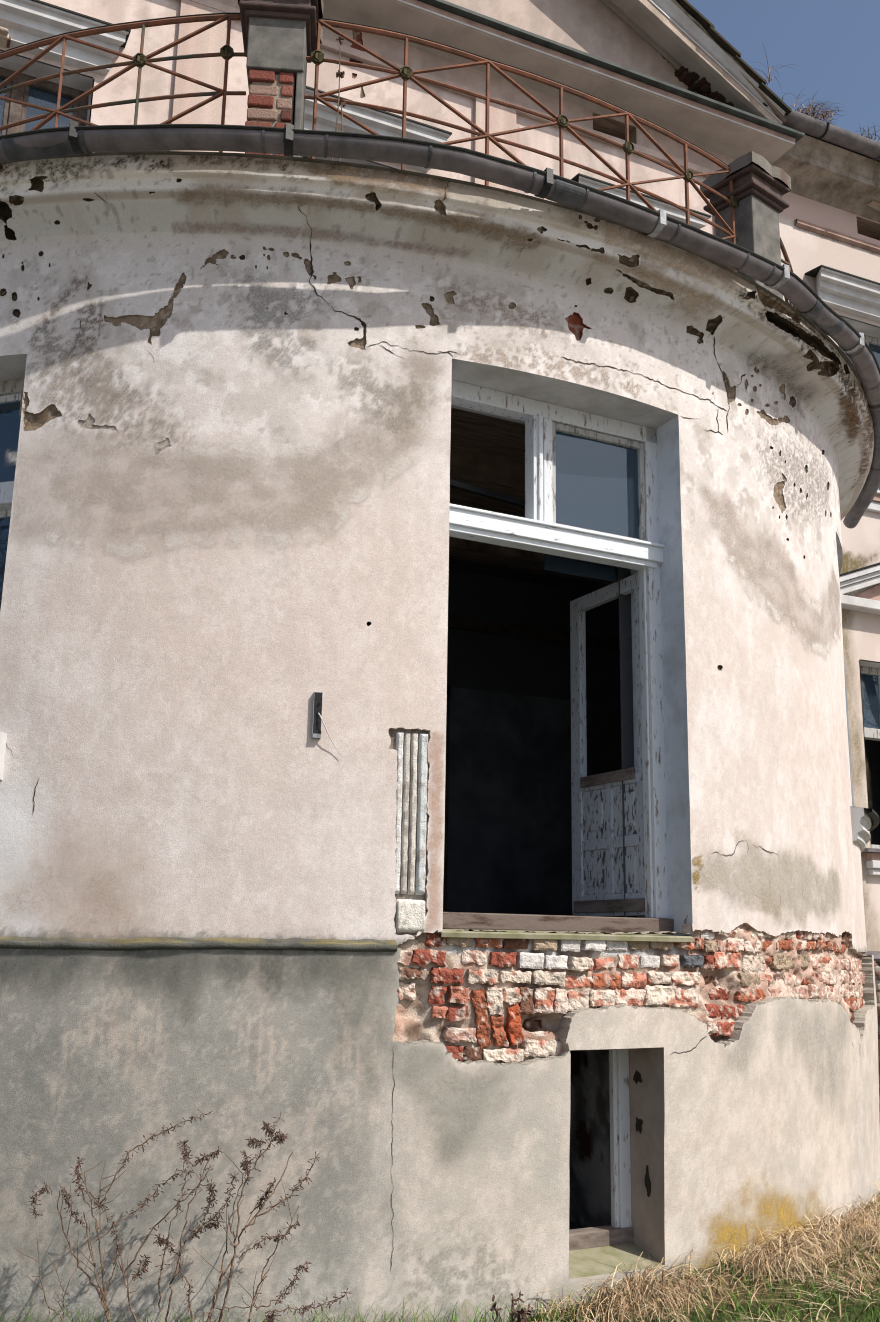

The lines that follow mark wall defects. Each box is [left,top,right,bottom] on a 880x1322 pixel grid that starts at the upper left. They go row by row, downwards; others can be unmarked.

flaking render [19,272,187,455]
peeling [200,246,362,367]
crack [298,206,462,359]
flaking render [415,291,604,341]
crack [563,337,746,435]
flaking render [712,365,796,426]
leakage [52,356,435,557]
flaking render [766,444,832,520]
leakage [705,490,841,656]
leakage [699,845,840,920]
flaking render [392,915,880,1117]